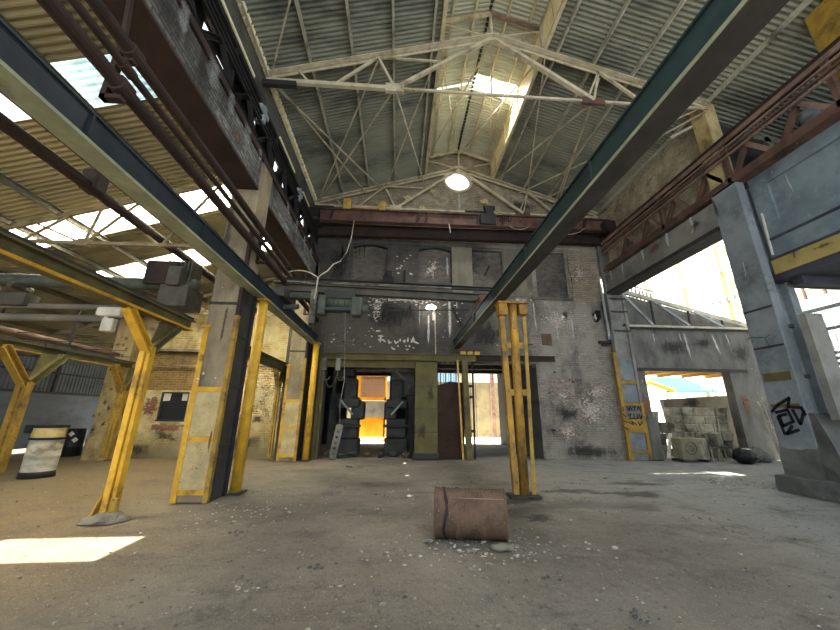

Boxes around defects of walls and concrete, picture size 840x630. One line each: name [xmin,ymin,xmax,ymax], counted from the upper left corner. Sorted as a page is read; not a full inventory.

water stain [371,305,430,343]
peeling [365,297,464,350]
spalling [143,393,158,415]
spalling [542,378,615,444]
water stain [568,446,616,457]